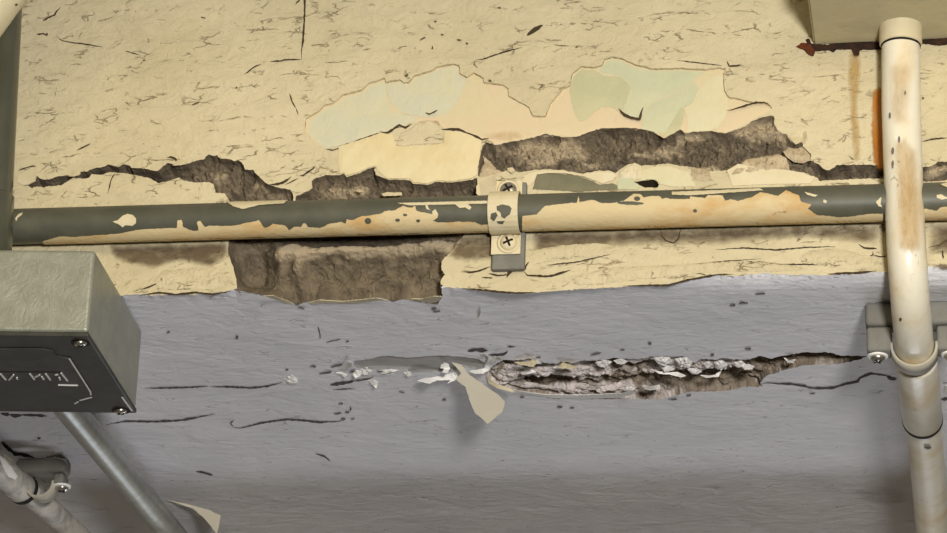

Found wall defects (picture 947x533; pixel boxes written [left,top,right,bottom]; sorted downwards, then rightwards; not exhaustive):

crack [244,0,306,75]
corrosion [922,38,947,46]
corrosion [796,39,881,135]
spalling [17,58,900,202]
corrosion [872,88,883,168]
spalling [923,161,947,182]
spalling [216,233,464,313]
crack [151,381,282,389]
crack [106,414,344,428]
spalling [311,342,866,424]
crack [763,373,896,390]